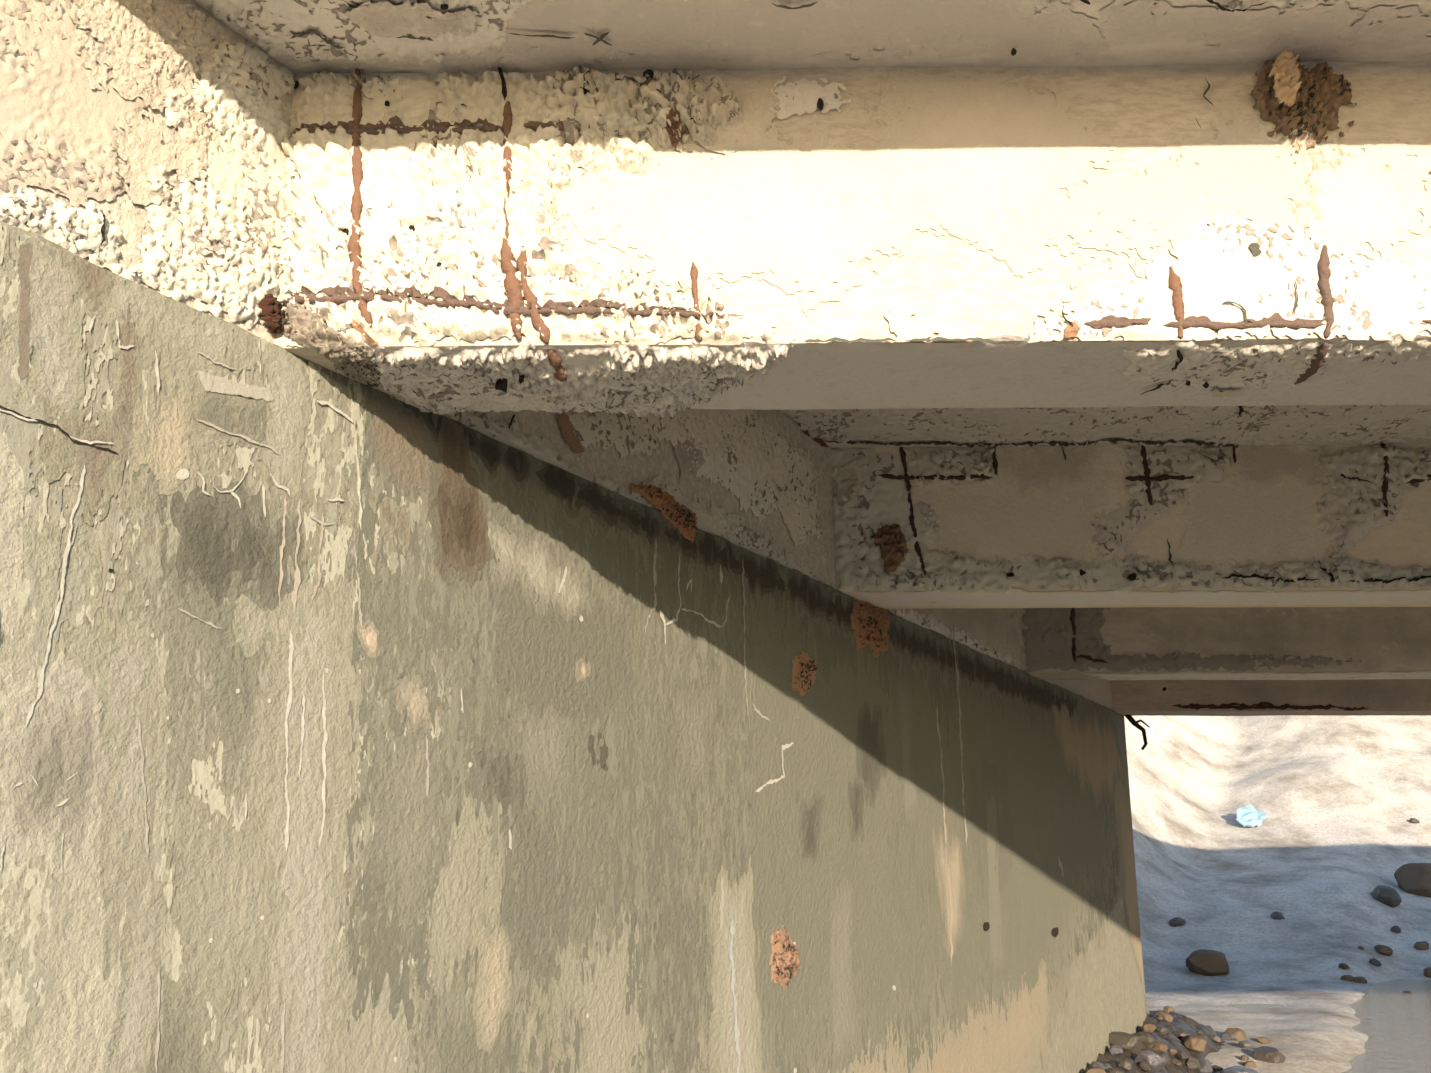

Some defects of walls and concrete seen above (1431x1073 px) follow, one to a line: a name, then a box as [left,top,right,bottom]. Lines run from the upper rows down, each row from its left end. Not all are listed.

crack [0,405,118,727]
spalling [0,0,1431,691]
leakage [0,223,1431,1073]